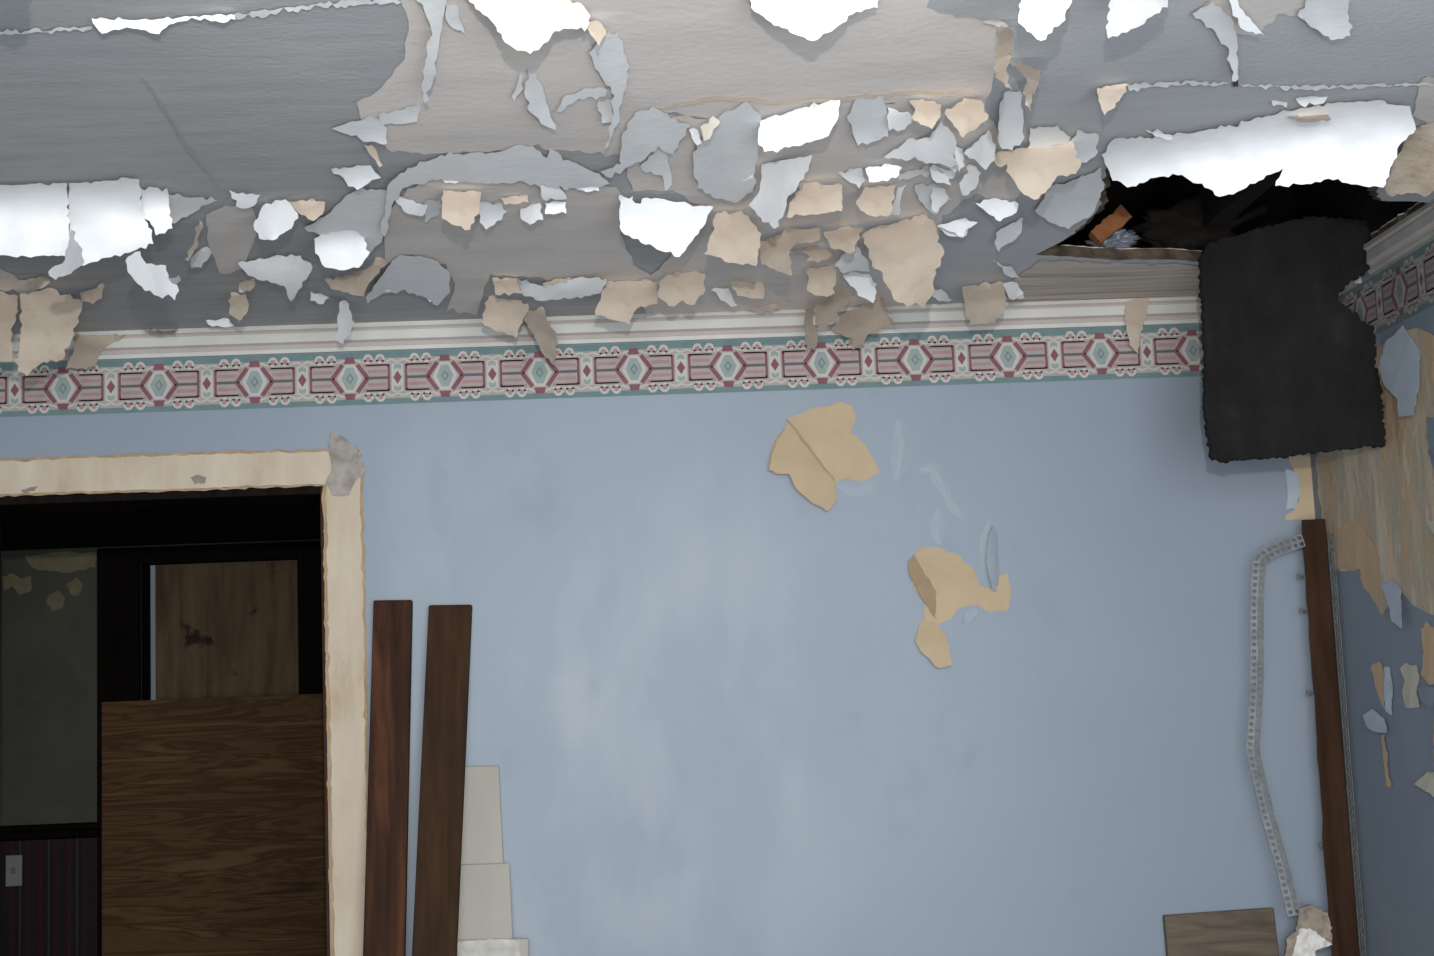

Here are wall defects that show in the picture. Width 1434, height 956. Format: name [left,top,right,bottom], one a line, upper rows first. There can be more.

peeling [0,0,1434,376]
peeling [769,402,881,511]
peeling [908,525,1011,668]
peeling [1336,521,1380,587]
peeling [1371,622,1434,709]
peeling [1381,734,1391,787]